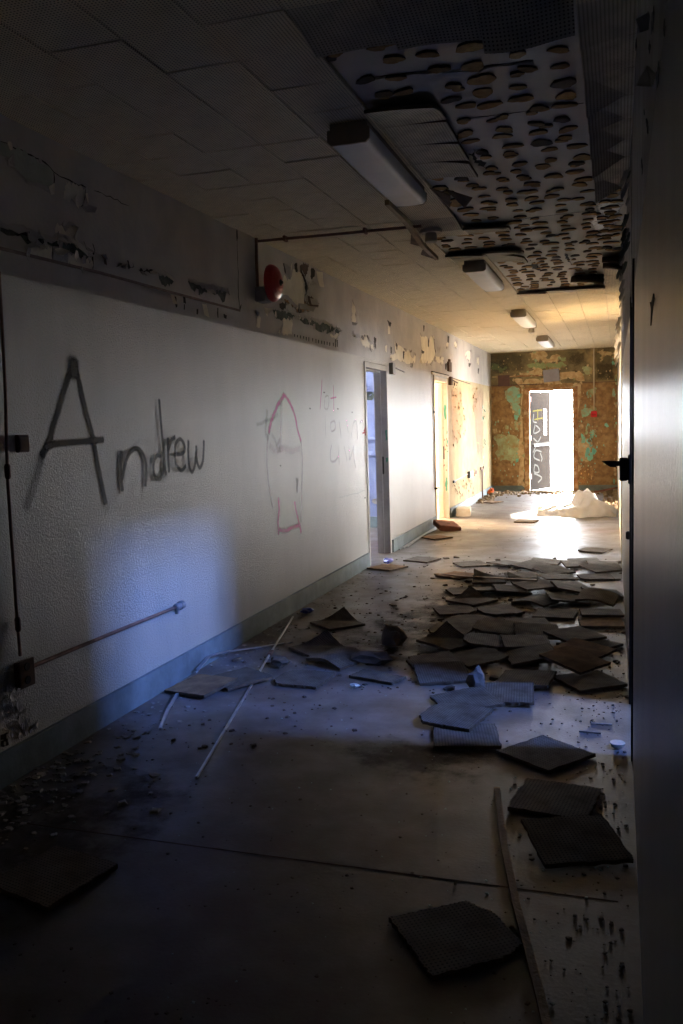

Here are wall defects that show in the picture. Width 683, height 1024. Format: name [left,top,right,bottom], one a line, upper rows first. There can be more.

flaking render [101,254,230,319]
peeling [254,157,643,487]